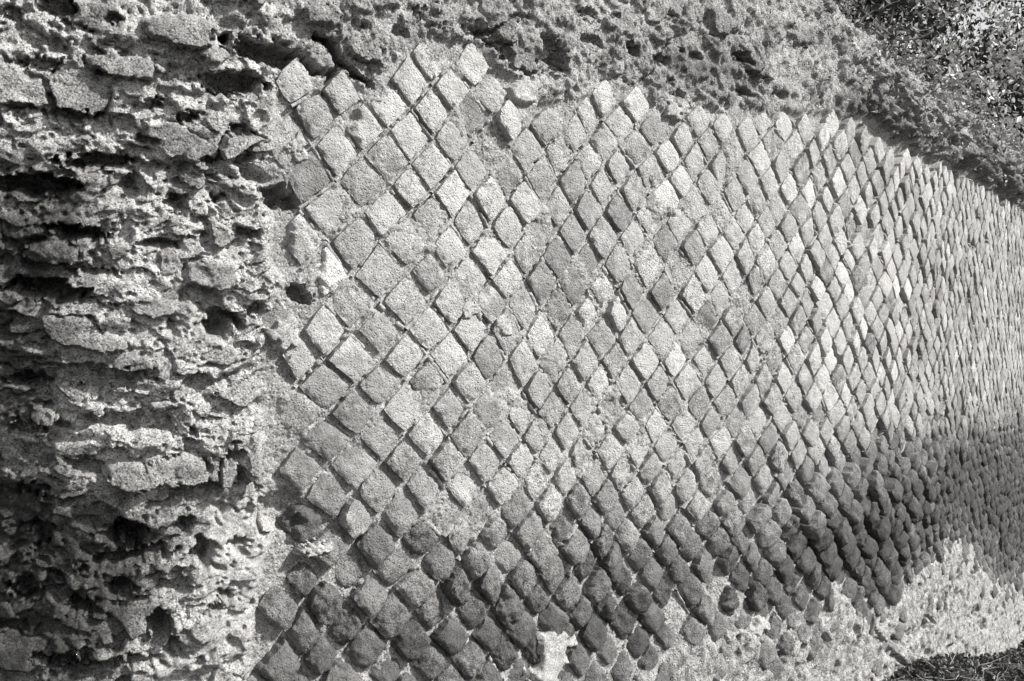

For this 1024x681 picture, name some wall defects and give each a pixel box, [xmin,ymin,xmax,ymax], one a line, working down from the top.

spalling [0,0,329,681]
spalling [293,0,1024,208]